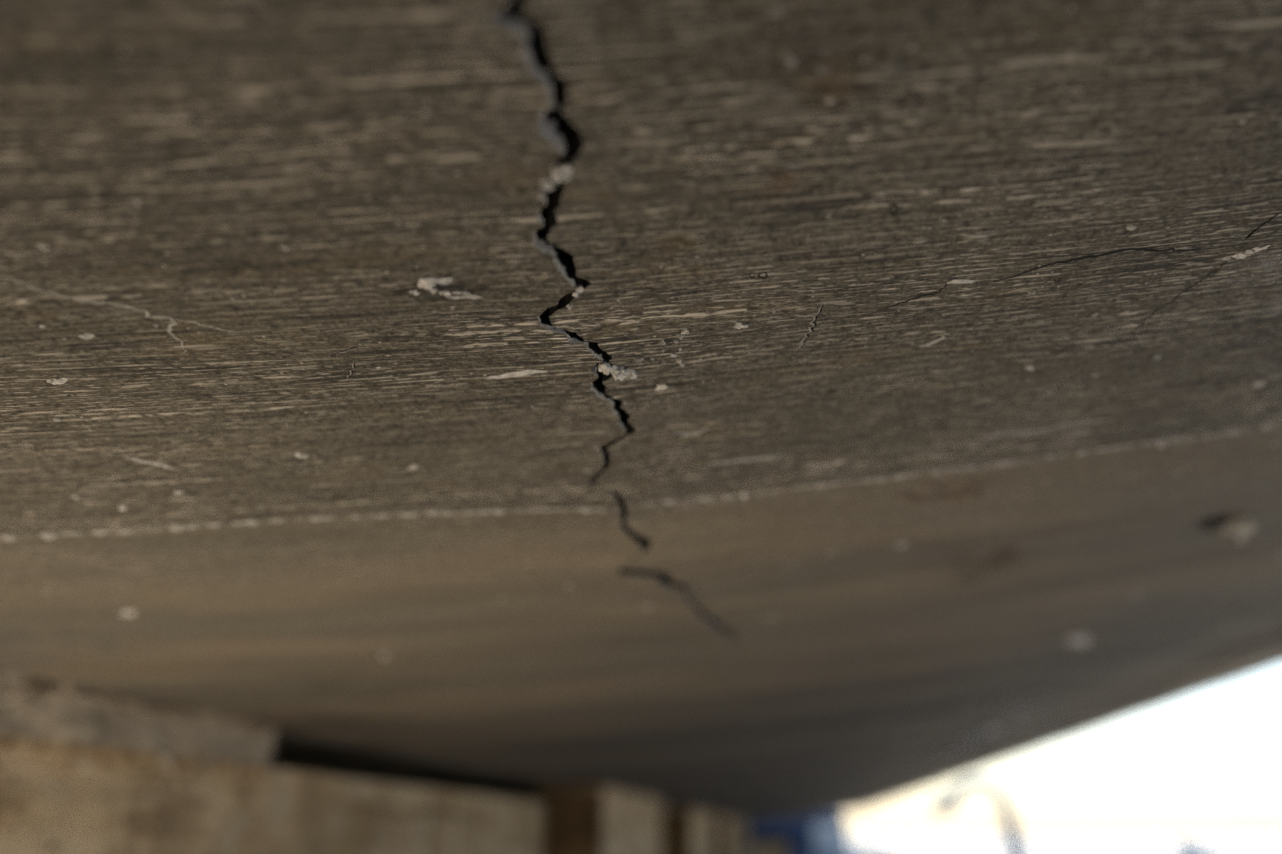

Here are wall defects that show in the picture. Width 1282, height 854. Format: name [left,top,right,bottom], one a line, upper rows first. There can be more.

crack [489,0,725,632]
crack [796,305,823,351]
crack [878,284,948,311]
crack [995,211,1282,340]